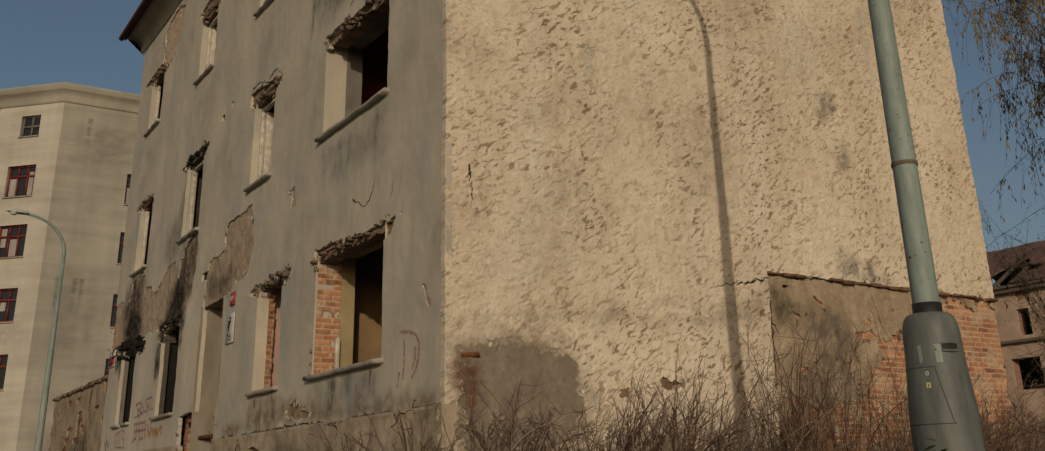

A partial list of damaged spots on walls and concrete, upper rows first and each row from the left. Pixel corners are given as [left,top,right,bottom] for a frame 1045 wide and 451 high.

flaking render [107,206,254,356]
flaking render [767,271,913,451]
flaking render [938,290,1045,451]